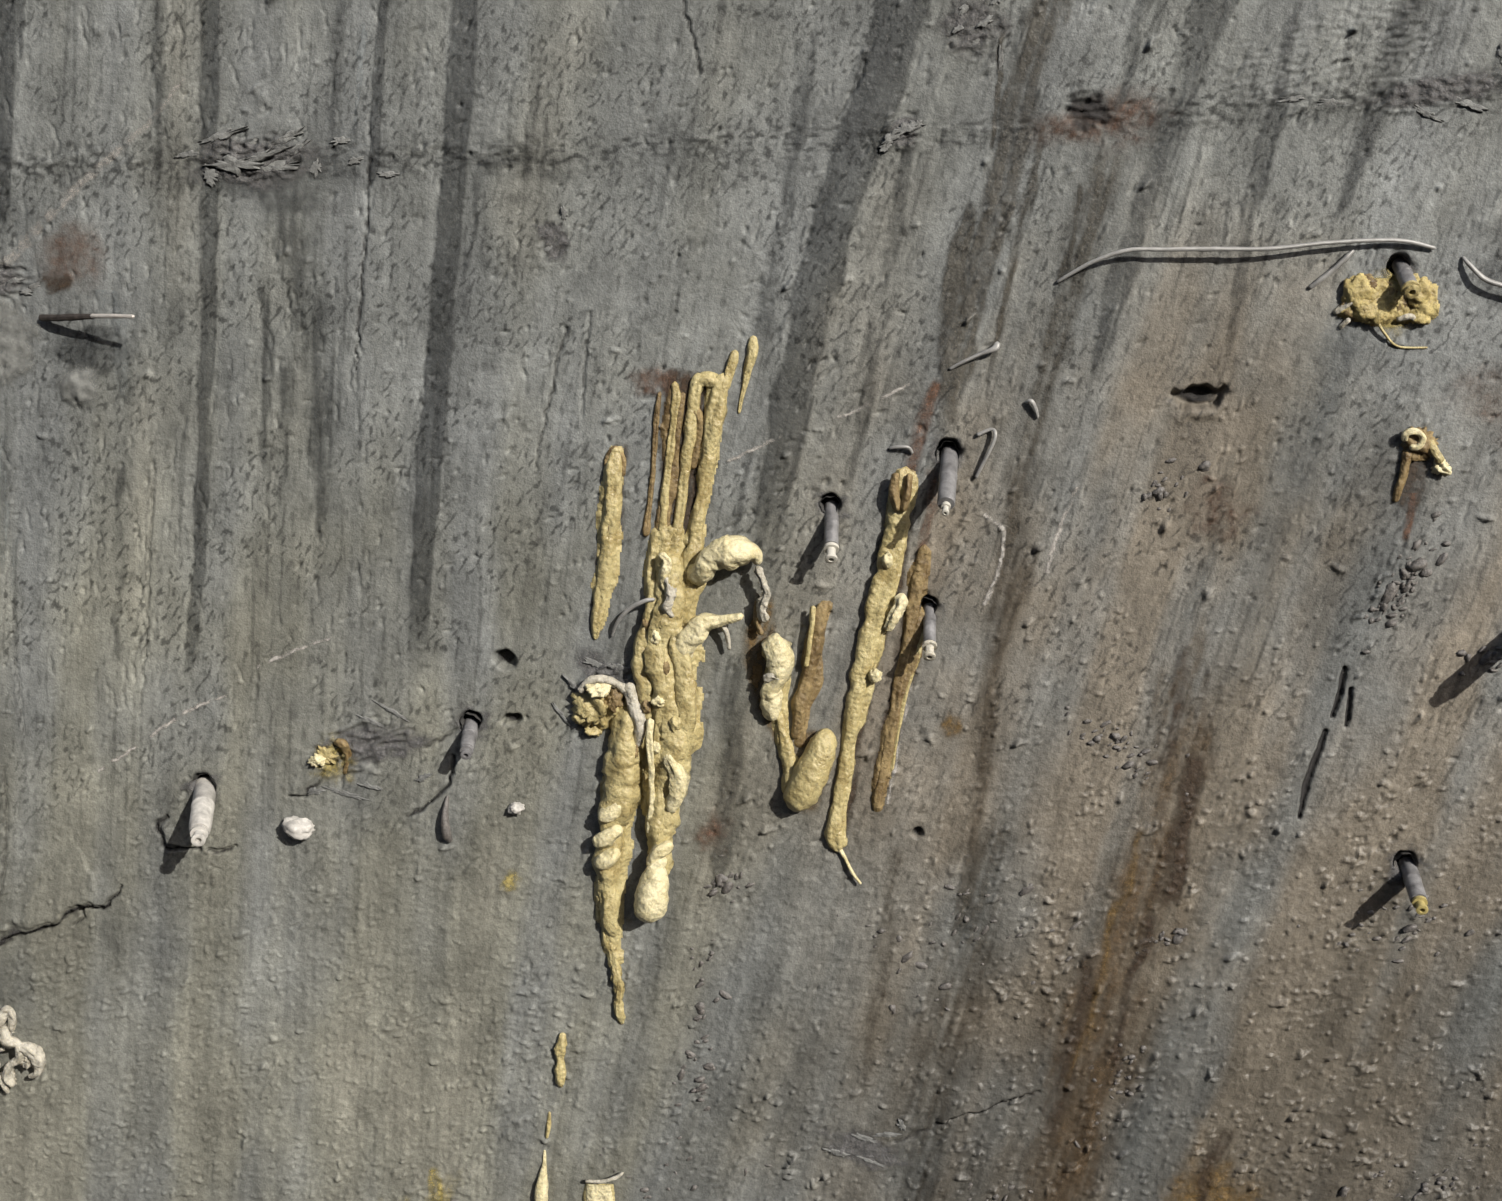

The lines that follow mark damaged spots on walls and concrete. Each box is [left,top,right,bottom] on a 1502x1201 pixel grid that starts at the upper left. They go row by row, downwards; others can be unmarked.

spalling [175,126,322,189]
damp [410,0,553,628]
crack [0,885,123,945]
rust [1029,651,1211,1201]